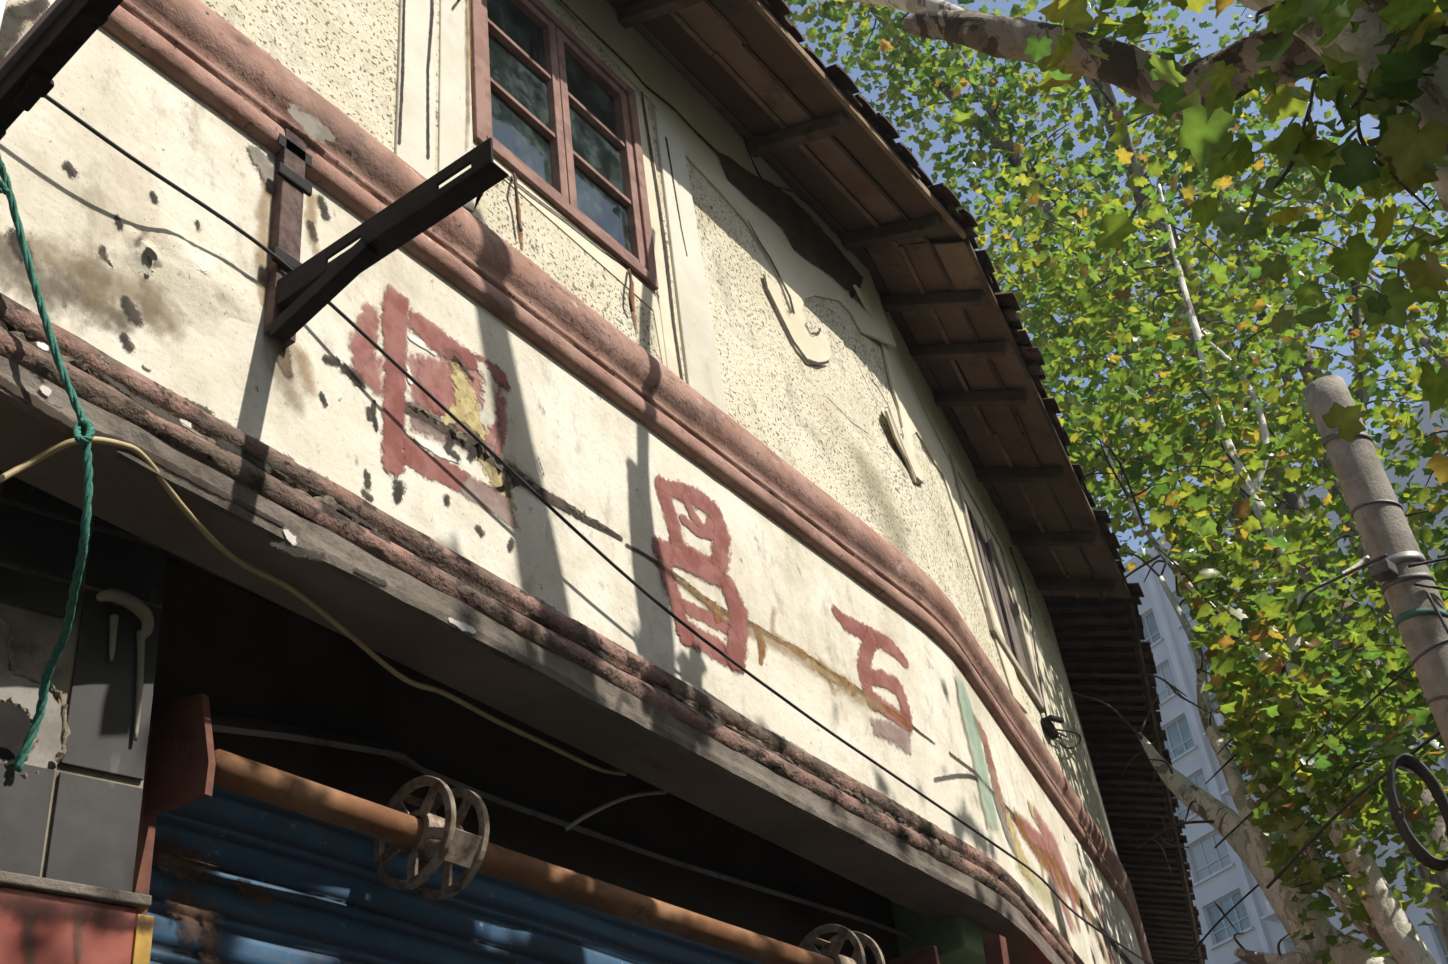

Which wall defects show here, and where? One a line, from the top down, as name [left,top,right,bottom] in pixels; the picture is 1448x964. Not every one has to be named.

damp [63,160,78,177]
damp [0,227,177,351]
spalling [448,617,476,634]
spalling [647,680,970,860]
corrosion [154,835,275,964]